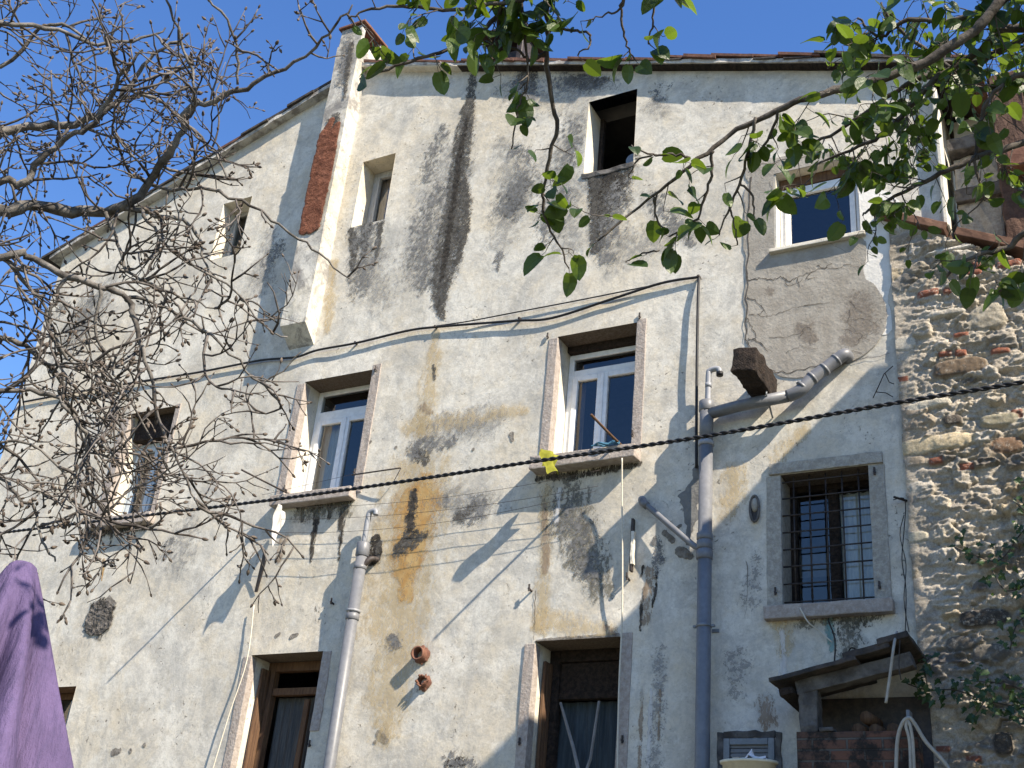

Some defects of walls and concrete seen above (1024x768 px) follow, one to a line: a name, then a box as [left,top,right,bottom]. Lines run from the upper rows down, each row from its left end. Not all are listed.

flaking render [298,112,341,235]
damp [403,74,478,320]
damp [490,115,698,269]
damp [345,220,385,302]
crack [744,156,889,374]
damp [291,501,356,563]
damp [404,432,459,467]
damp [442,492,491,528]
damp [534,461,642,605]
flaking render [83,595,116,640]